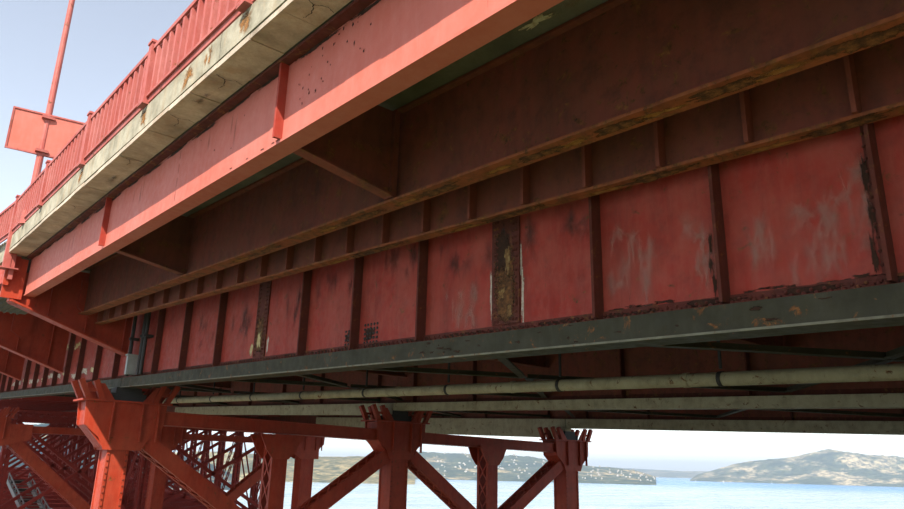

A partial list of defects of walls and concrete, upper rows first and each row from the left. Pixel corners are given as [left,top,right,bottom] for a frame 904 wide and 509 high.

corrosion [224,317,298,365]
corrosion [404,204,544,354]
corrosion [687,153,886,311]